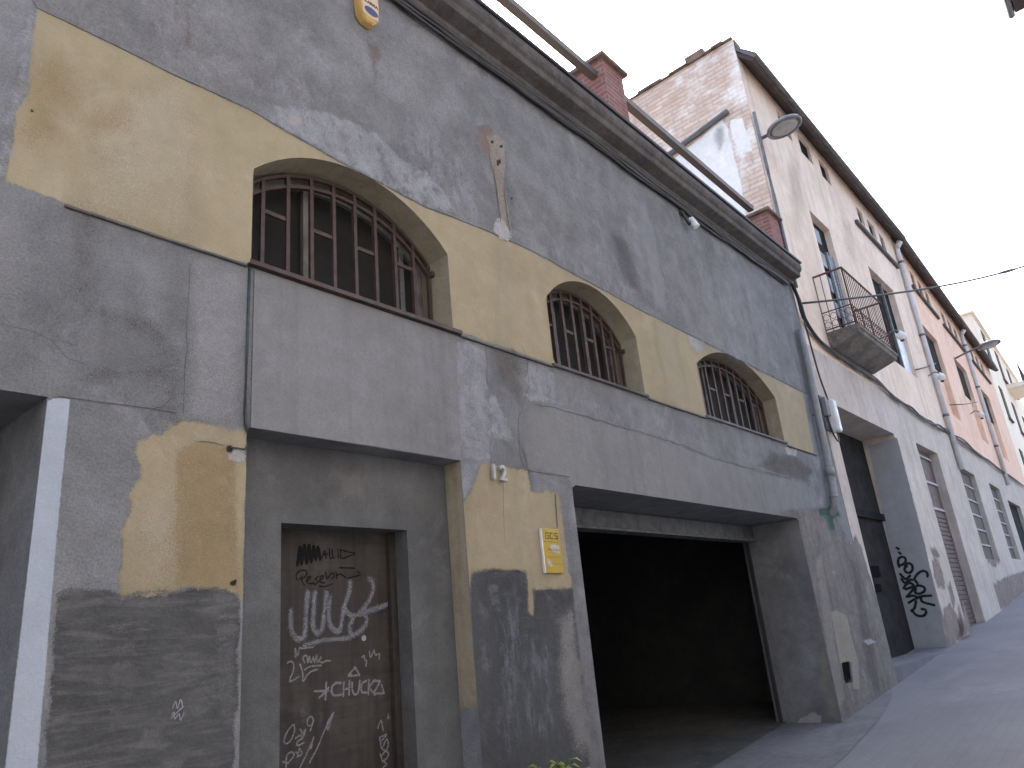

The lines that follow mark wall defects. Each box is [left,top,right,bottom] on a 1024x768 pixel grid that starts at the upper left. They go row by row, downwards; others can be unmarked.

spalling [476,122,513,241]
peeling [116,420,248,600]
peeling [456,340,572,615]
crack [518,345,789,479]